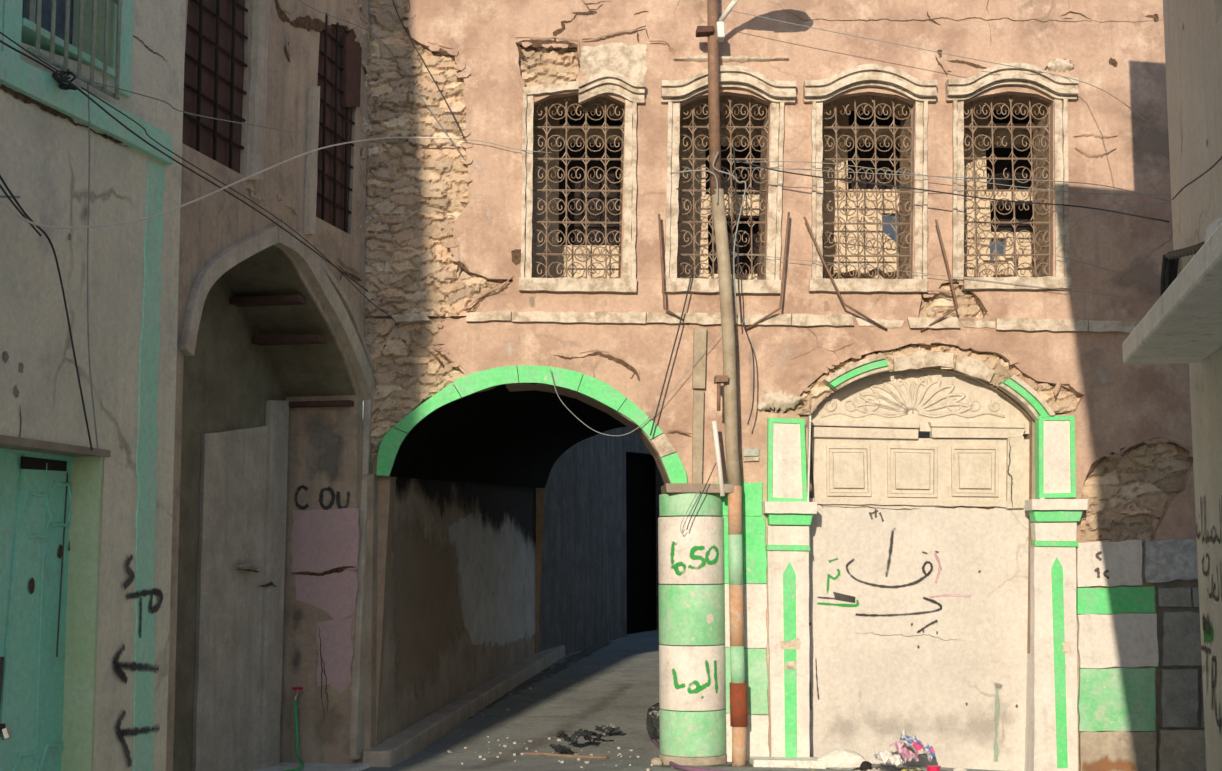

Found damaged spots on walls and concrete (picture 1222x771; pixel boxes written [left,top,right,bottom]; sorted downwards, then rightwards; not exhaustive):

flaking render [519,42,648,87]
crack [516,1,680,66]
flaking render [342,0,512,462]
spalling [511,249,521,265]
flaking render [759,340,1081,415]
flaking render [1080,437,1193,542]
crack [235,563,356,588]
crack [319,628,328,722]